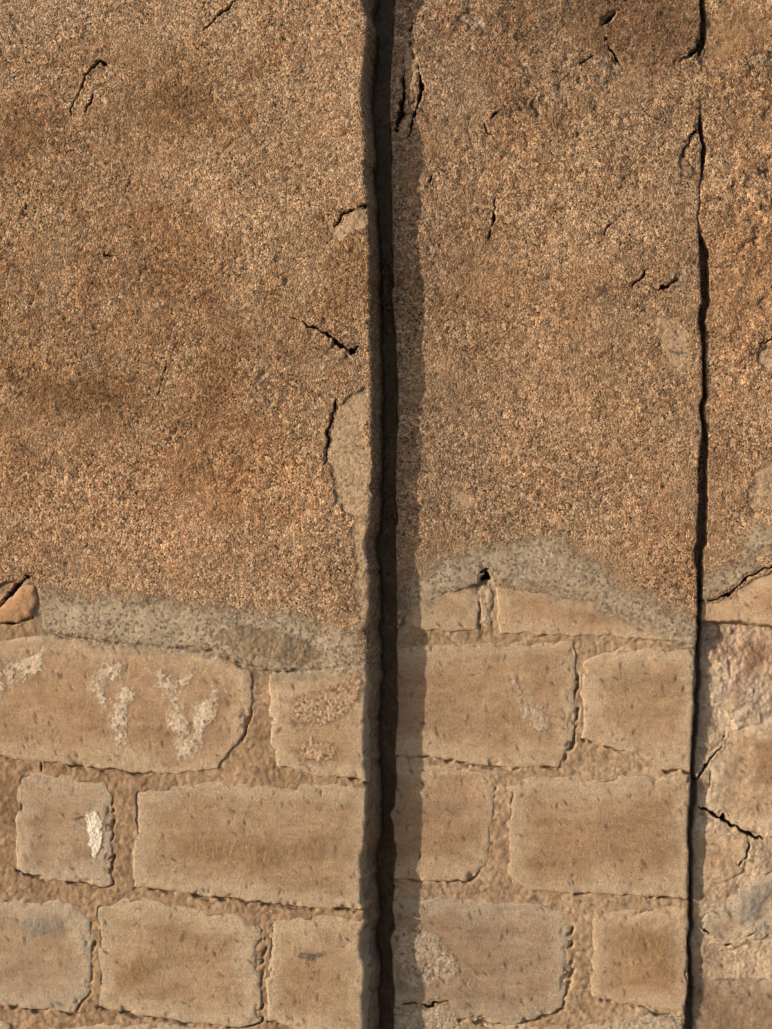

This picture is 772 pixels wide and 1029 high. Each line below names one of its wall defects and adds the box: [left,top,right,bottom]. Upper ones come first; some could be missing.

crack [196,0,244,36]
crack [66,56,110,121]
crack [392,15,429,136]
crack [288,314,360,358]
peeling [323,389,374,629]
water stain [406,536,697,647]
crack [697,562,772,606]
water stain [703,525,772,594]
water stain [0,652,43,698]
water stain [37,591,367,762]
crack [694,729,767,867]
water stain [74,811,103,858]